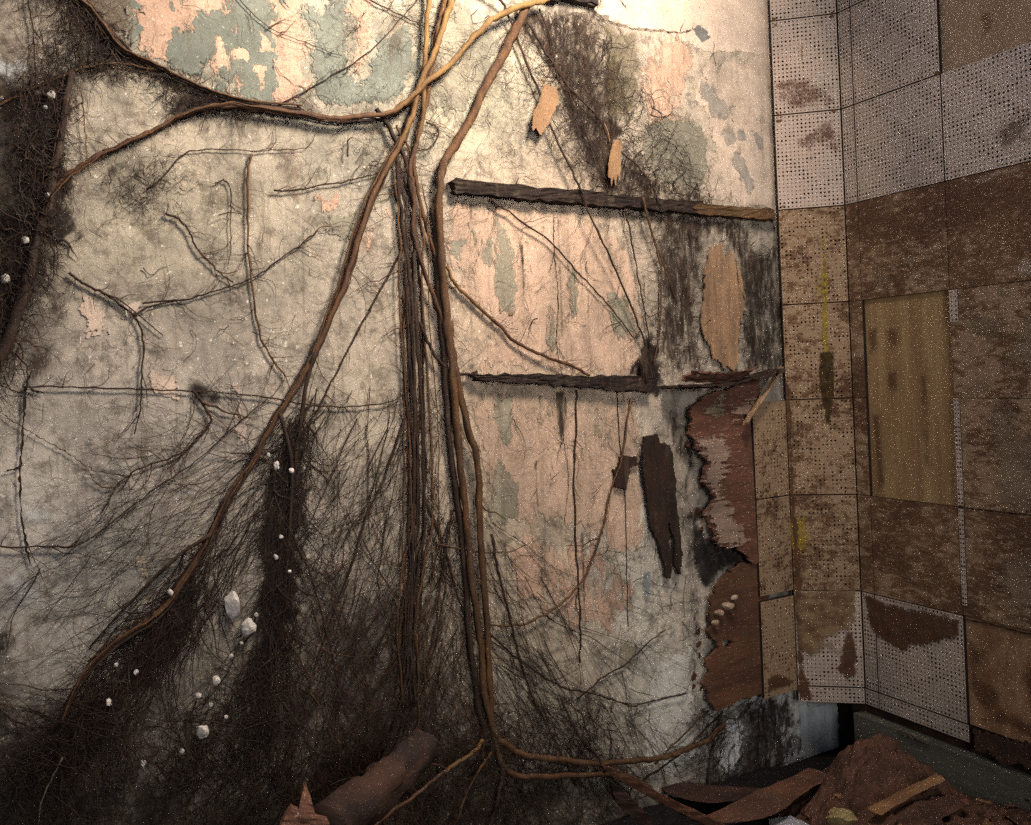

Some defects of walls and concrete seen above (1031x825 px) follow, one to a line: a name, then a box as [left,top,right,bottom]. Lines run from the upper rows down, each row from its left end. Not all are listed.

peeling [90,0,502,116]
damp [509,5,704,201]
peeling [594,0,777,218]
damp [777,80,831,107]
damp [801,124,837,149]
damp [235,399,313,694]
damp [556,392,567,444]
damp [630,212,783,396]
damp [668,411,749,586]
damp [817,238,834,423]
damp [740,382,960,773]